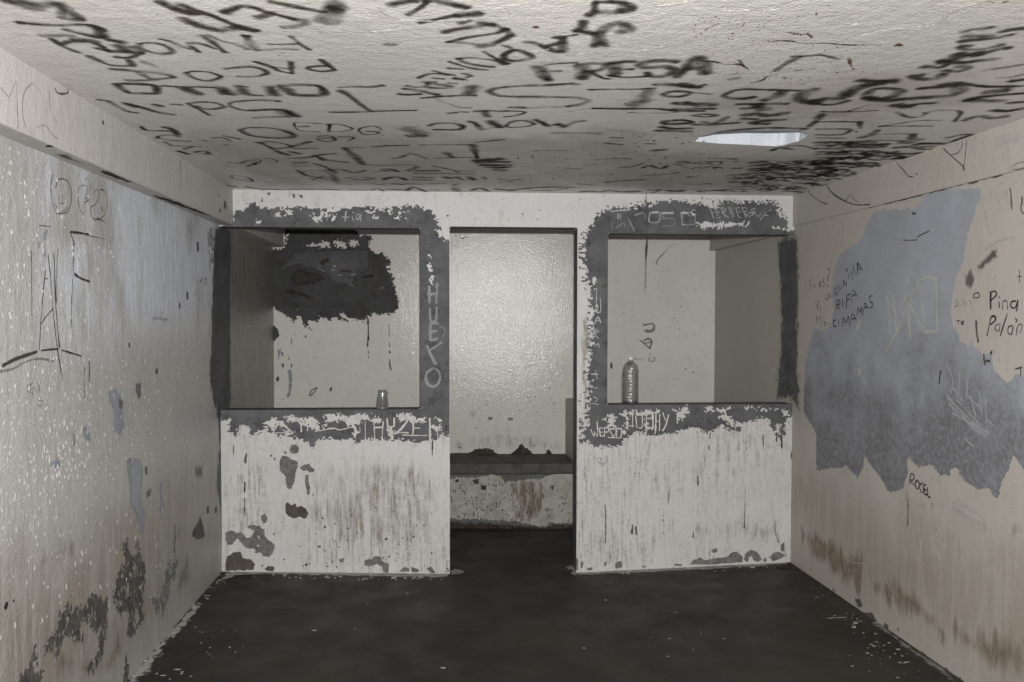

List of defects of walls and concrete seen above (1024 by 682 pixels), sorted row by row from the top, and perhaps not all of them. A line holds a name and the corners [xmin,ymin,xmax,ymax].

peeling [197,192,449,519]
peeling [578,188,1024,498]
flaking render [18,457,217,682]
flaking render [364,556,450,573]
flaking render [576,558,622,570]
leakage [811,537,861,592]